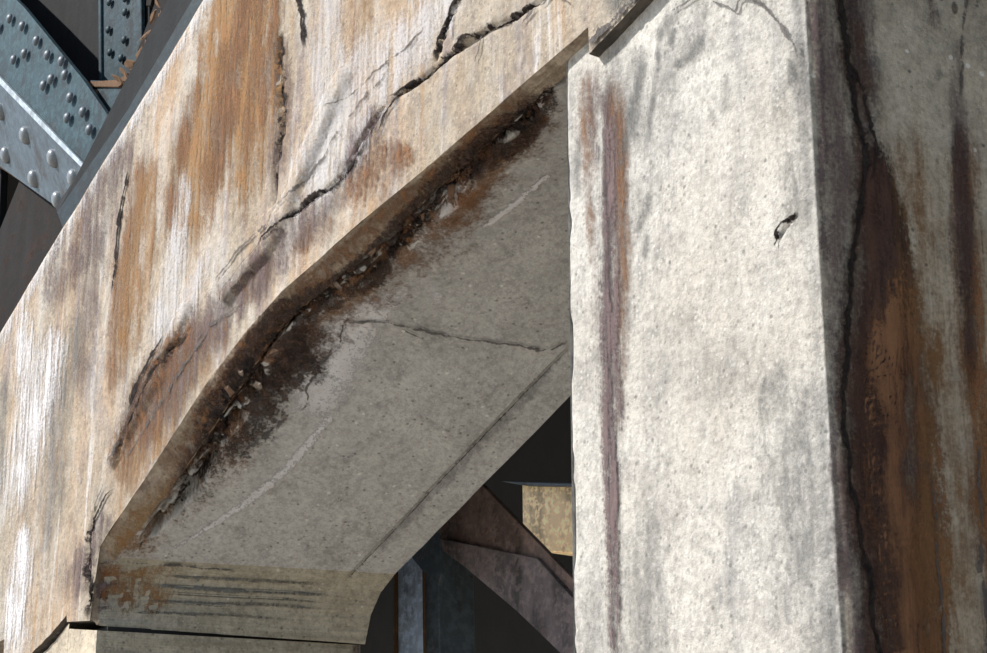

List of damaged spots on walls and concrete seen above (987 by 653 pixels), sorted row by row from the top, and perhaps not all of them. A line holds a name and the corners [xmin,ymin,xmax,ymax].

crack [82,486,110,615]
water stain [64,512,147,598]
rust [96,565,173,614]
water stain [127,0,456,447]
water stain [171,279,443,548]
rust [107,0,522,554]
crack [216,0,571,278]
water stain [436,183,473,218]
rust [579,76,630,652]
crack [774,213,797,245]
crack [811,0,890,653]
rust [850,90,987,653]